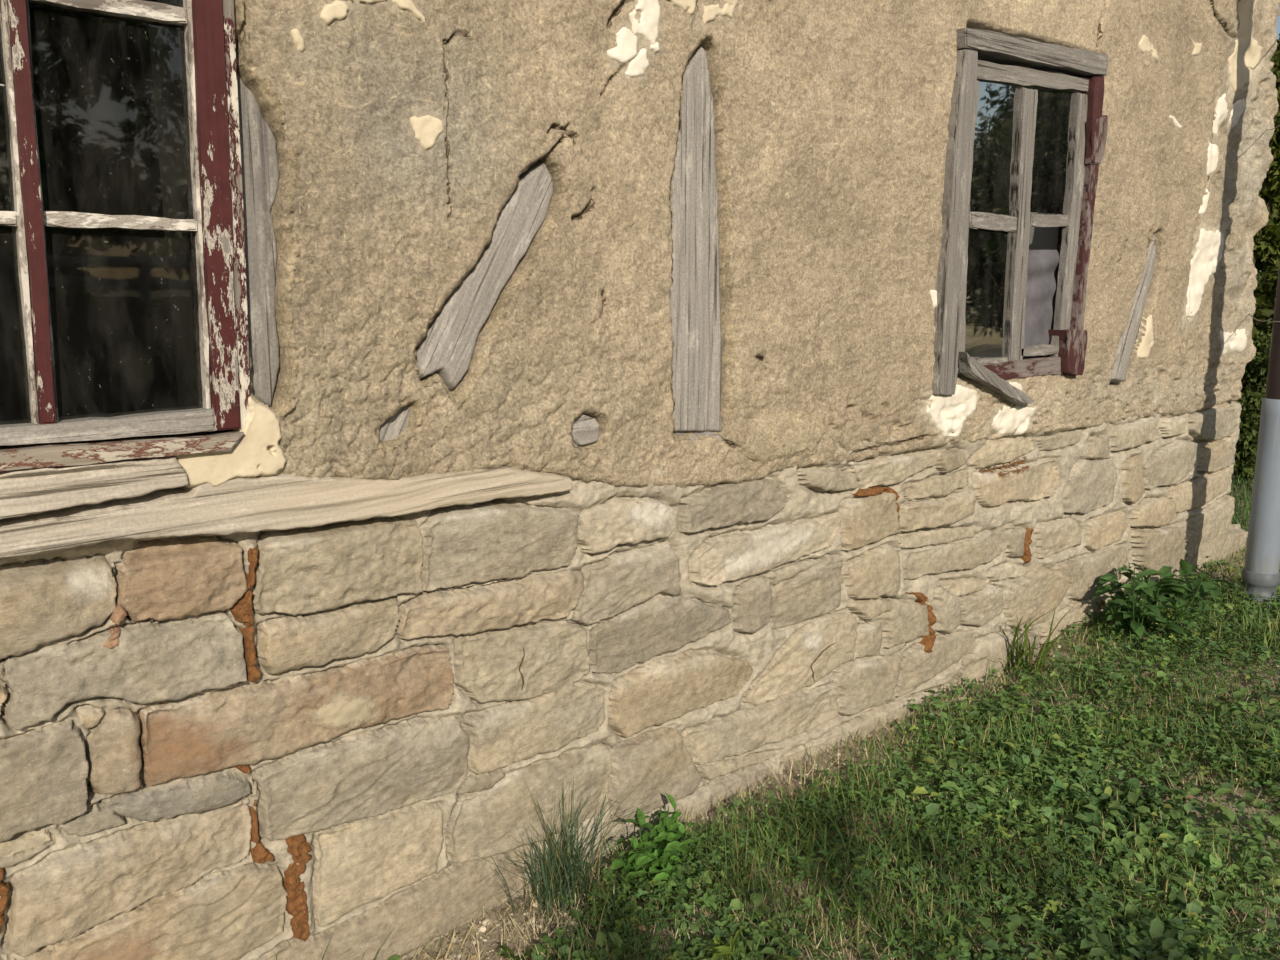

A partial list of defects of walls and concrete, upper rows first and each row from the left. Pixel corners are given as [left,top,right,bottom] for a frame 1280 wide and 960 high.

spalling [234,0,285,129]
peeling [291,28,305,54]
peeling [320,0,427,30]
peeling [410,110,445,152]
crack [443,33,471,215]
spalling [606,0,739,441]
peeling [1179,0,1266,333]
peeling [175,148,300,488]
peeling [917,378,1038,445]